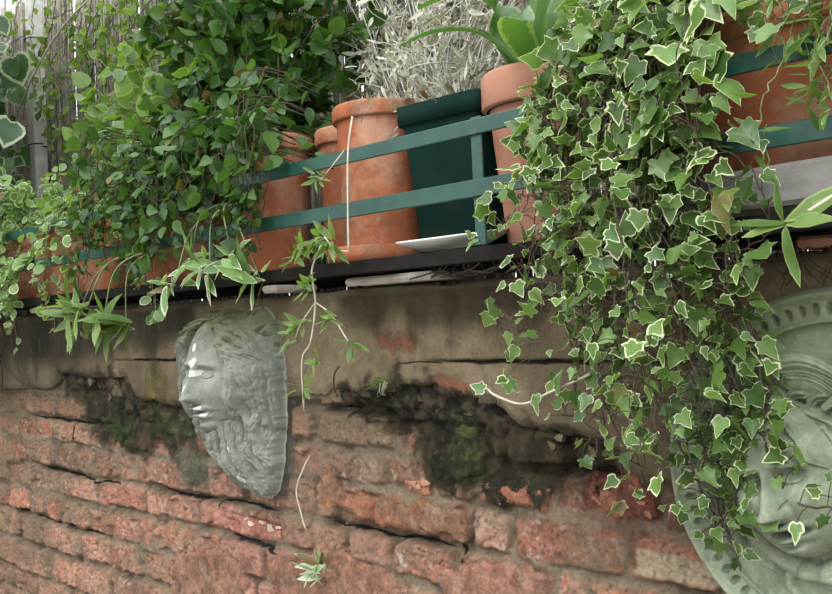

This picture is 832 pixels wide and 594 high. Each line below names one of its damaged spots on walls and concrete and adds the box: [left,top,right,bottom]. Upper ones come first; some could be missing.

leakage [58,366,185,458]
leakage [336,363,405,401]
leakage [367,378,457,490]
crack [402,357,615,365]
spalling [481,469,551,513]
leakage [450,413,613,510]
spalling [532,426,660,520]